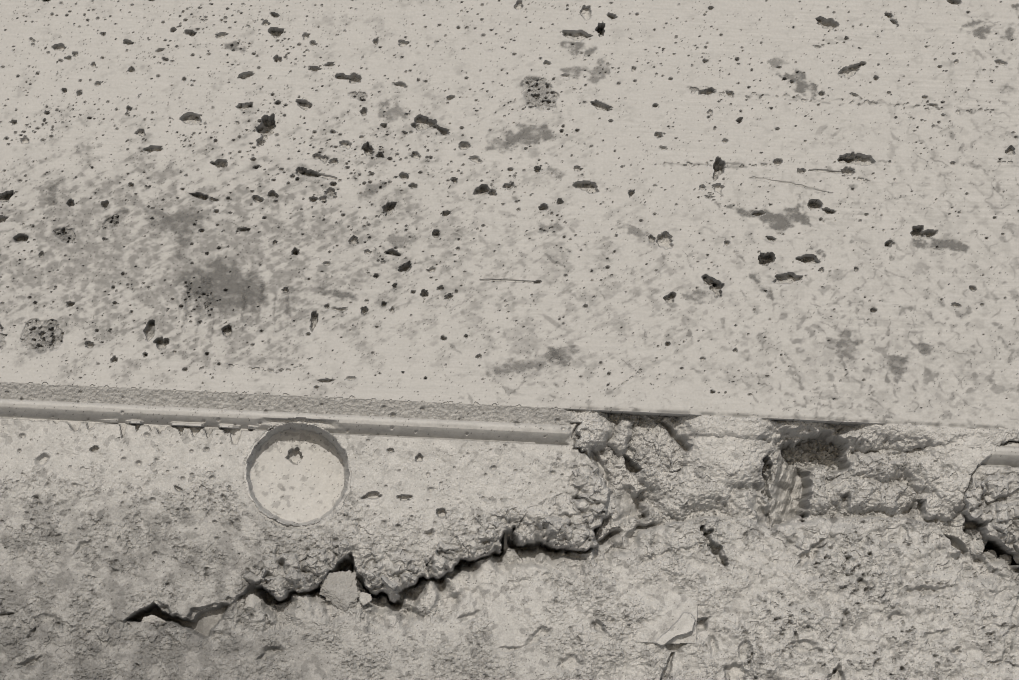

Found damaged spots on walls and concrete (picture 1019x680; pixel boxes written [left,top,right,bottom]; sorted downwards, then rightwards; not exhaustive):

spalling [566,410,1019,553]
crack [254,525,596,609]
crack [944,480,1019,667]
crack [125,603,229,639]
crack [660,652,675,680]